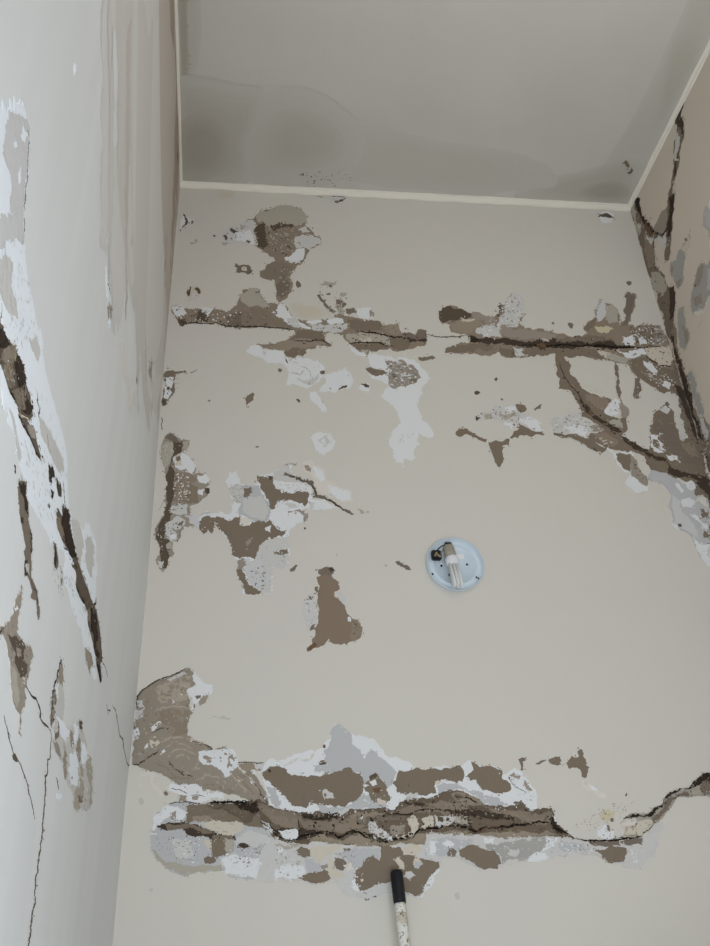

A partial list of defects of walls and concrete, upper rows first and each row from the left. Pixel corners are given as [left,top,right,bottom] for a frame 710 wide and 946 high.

crack [630,104,710,472]
crack [0,316,43,462]
flaking render [0,92,108,681]
flaking render [171,203,710,569]
crack [614,362,642,399]
crack [17,477,103,683]
flaking render [153,433,313,596]
flaking render [302,567,364,652]
crack [4,685,59,946]
flaking render [138,772,665,901]
flaking render [254,724,589,818]
crack [204,772,710,847]